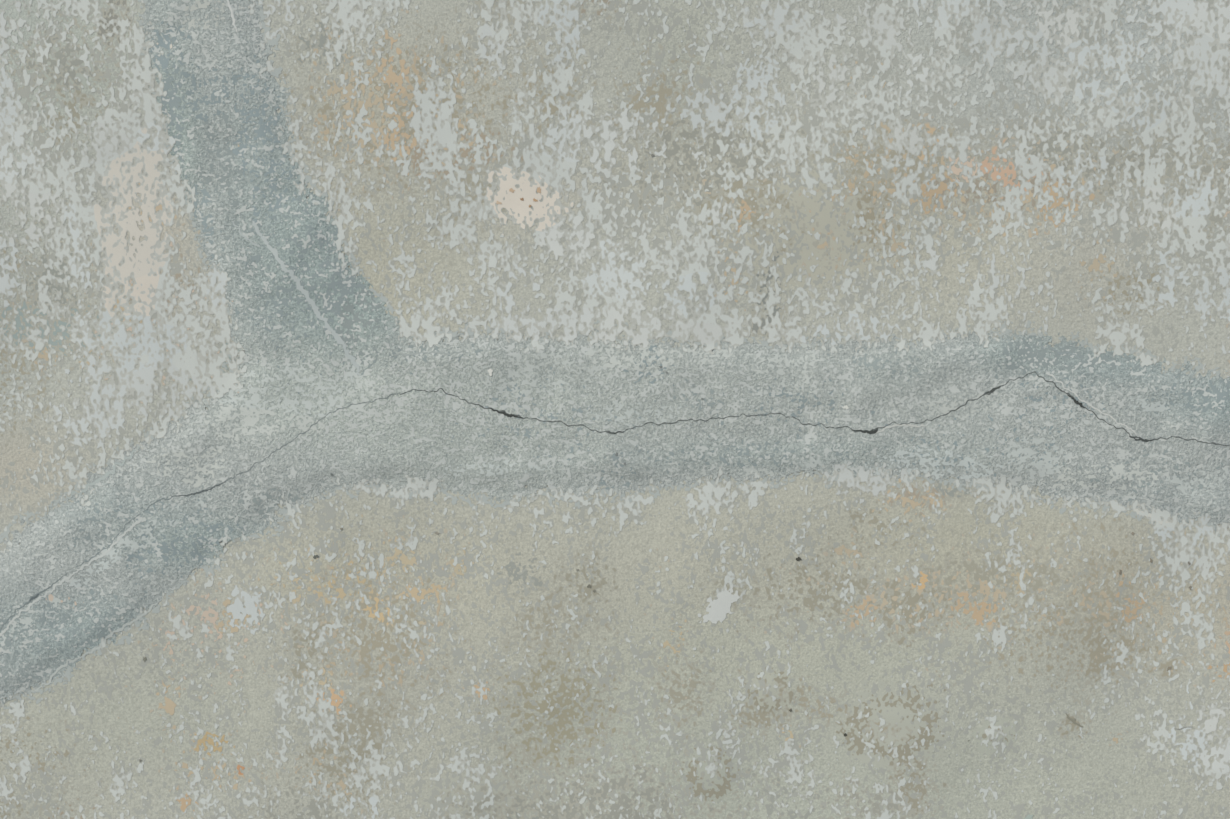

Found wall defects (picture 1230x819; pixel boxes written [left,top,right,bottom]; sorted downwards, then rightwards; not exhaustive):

crack [0,371,1229,636]